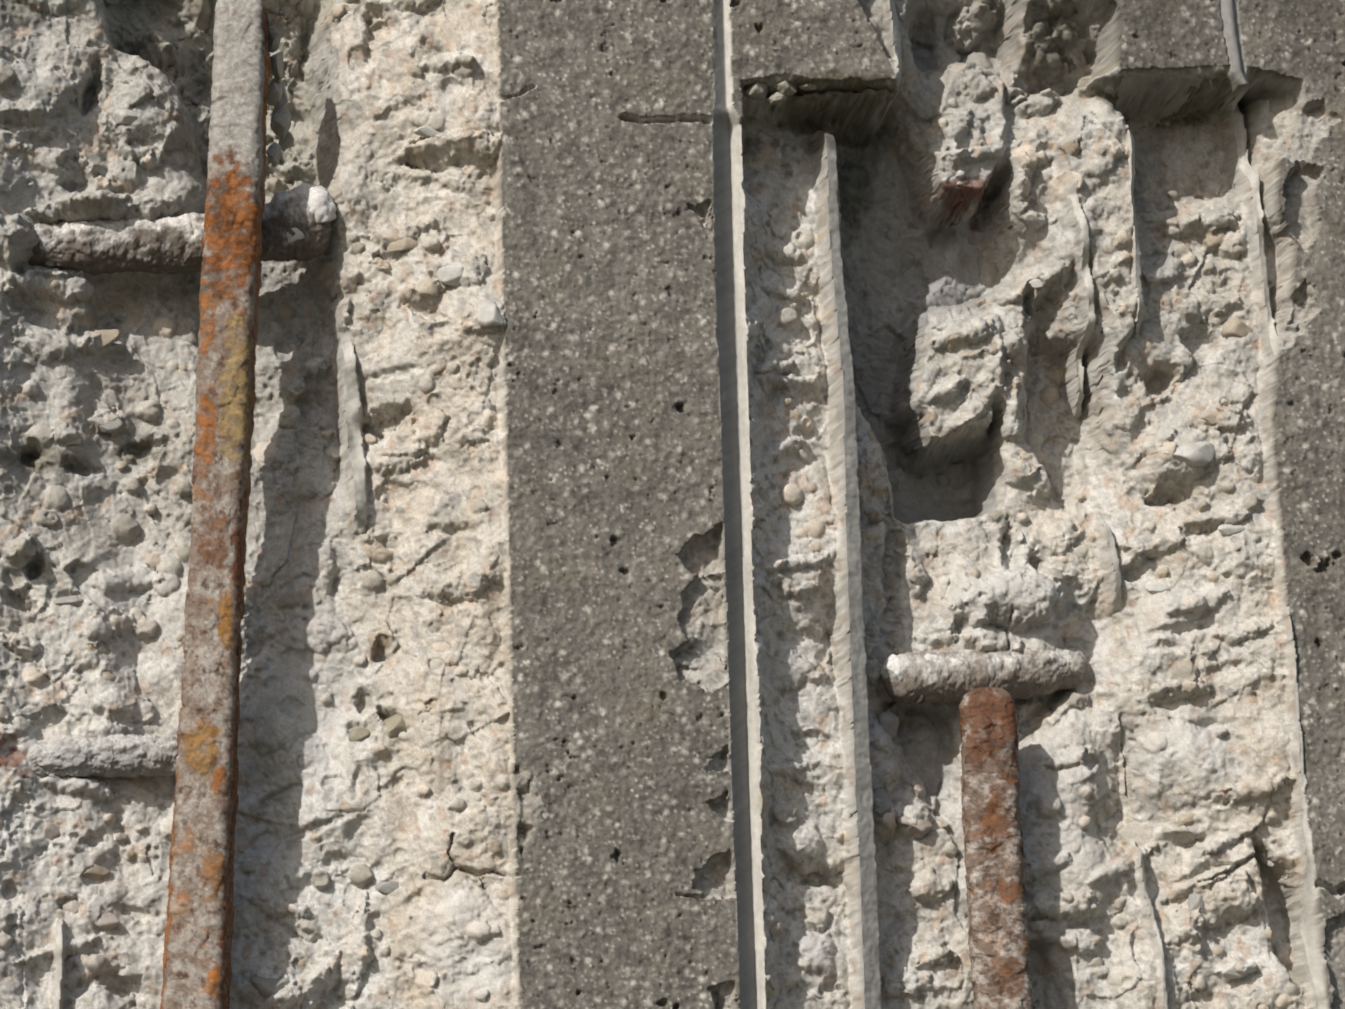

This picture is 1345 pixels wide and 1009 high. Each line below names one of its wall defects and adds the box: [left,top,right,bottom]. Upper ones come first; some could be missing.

rust [262,7,271,160]
rust [194,152,263,491]
spalling [0,0,217,1009]
spalling [229,0,546,1009]
spalling [740,0,1345,1009]
spalling [669,524,730,693]
rust [160,811,174,1009]
rust [177,499,247,1009]
spalling [692,851,737,898]
spalling [703,746,731,773]
spalling [707,791,734,823]
rust [959,687,1019,853]